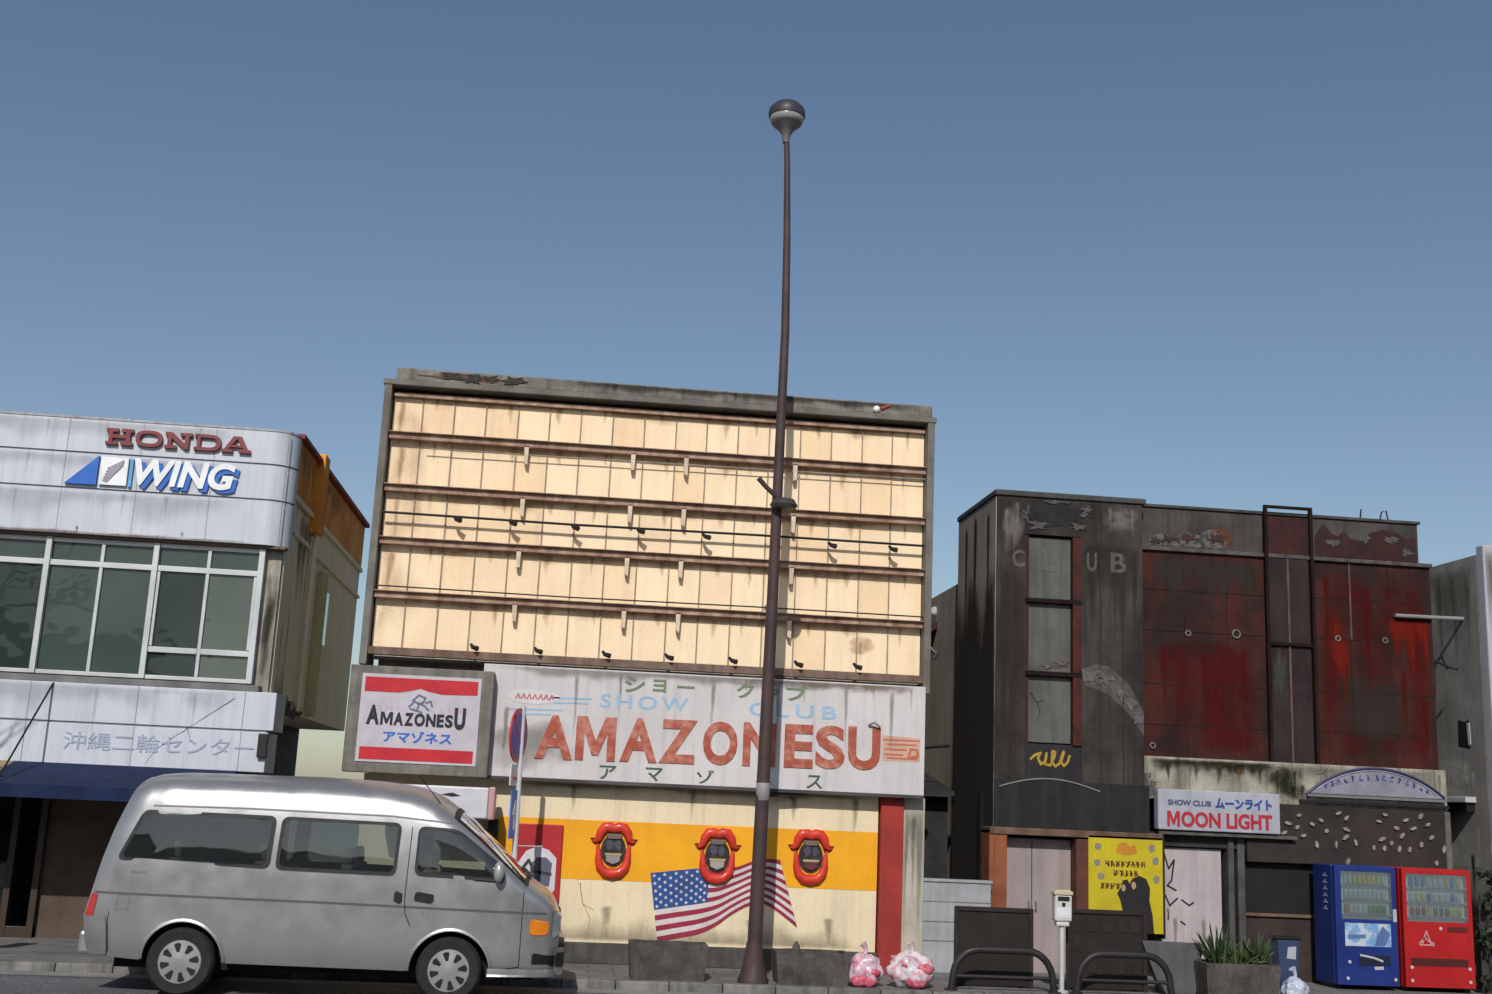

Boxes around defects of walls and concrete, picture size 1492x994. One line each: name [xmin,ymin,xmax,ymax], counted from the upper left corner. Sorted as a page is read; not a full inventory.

peeling [1150,530,1229,549]
peeling [1314,525,1418,563]